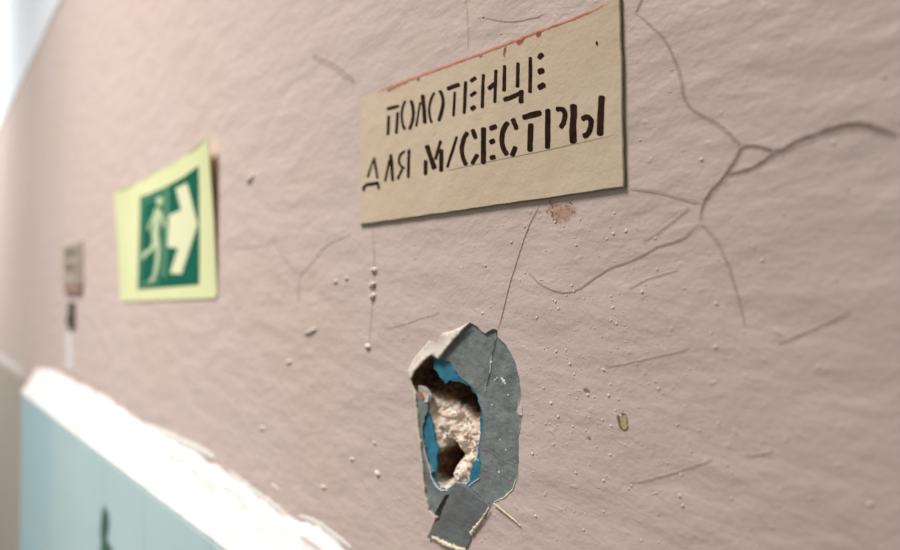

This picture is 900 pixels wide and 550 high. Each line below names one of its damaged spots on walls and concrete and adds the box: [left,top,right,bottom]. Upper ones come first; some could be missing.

crack [465,2,545,45]
crack [499,0,890,326]
peeling [408,322,522,550]